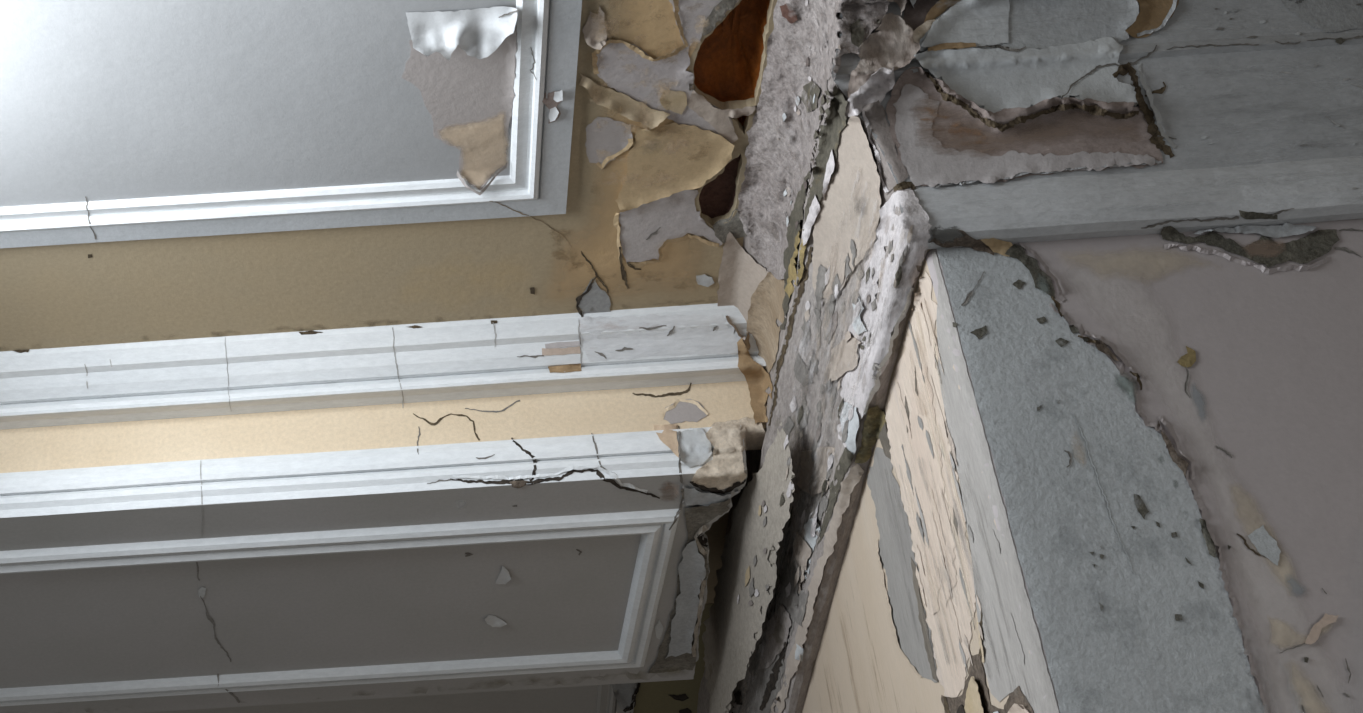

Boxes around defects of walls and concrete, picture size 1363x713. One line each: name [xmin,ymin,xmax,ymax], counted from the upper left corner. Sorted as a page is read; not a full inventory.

peeling [401,6,519,195]
flaking render [1141,208,1363,274]
crack [196,460,240,703]
crack [392,325,692,530]
flaking render [517,0,1179,713]
flaking render [1158,415,1195,479]
flaking render [1177,346,1204,417]
flaking render [1200,518,1231,557]